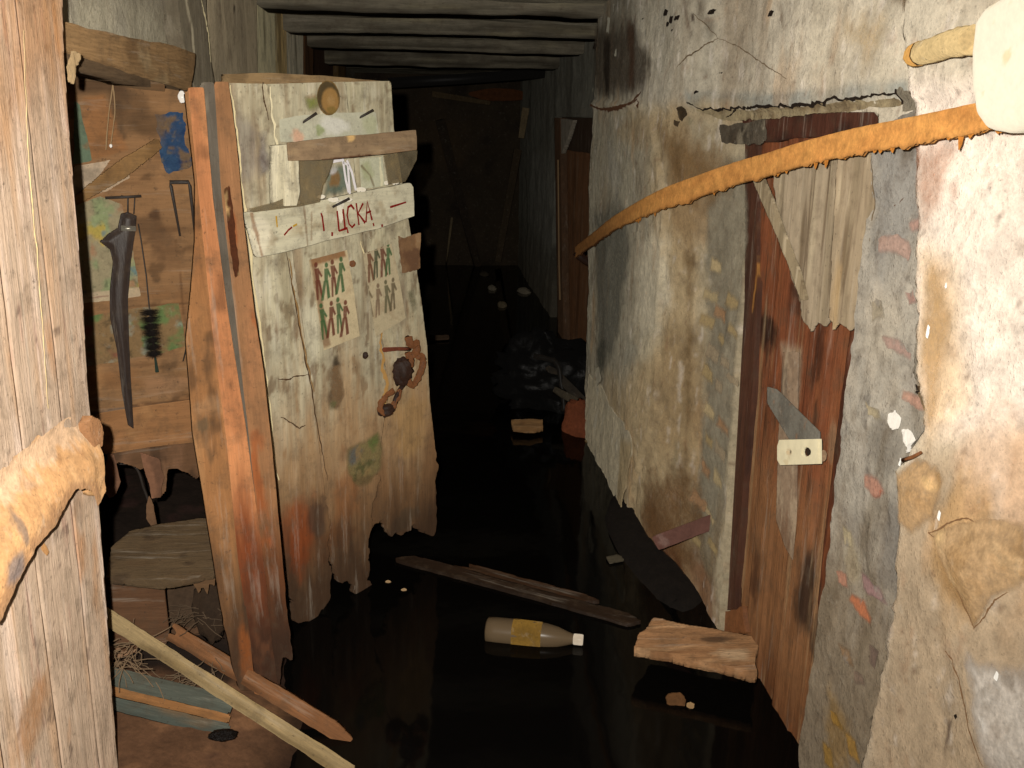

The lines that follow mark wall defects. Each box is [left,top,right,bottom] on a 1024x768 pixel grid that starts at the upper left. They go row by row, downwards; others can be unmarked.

crack [677,14,785,78]
spalling [674,87,916,146]
flaking render [798,146,930,768]